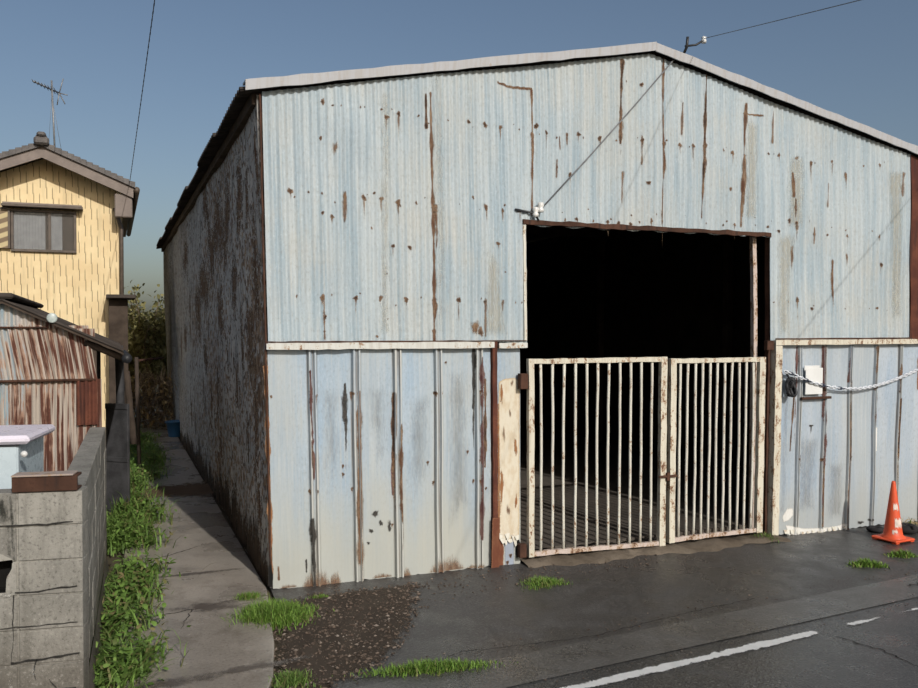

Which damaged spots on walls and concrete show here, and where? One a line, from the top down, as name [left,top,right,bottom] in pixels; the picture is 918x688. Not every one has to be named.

rust [415,92,438,341]
rust [615,59,627,144]
rust [679,74,708,224]
rust [722,103,780,227]
peeling [182,120,262,536]
rust [341,383,364,570]
rust [390,392,404,526]
rust [467,348,517,568]
spalling [0,560,13,597]